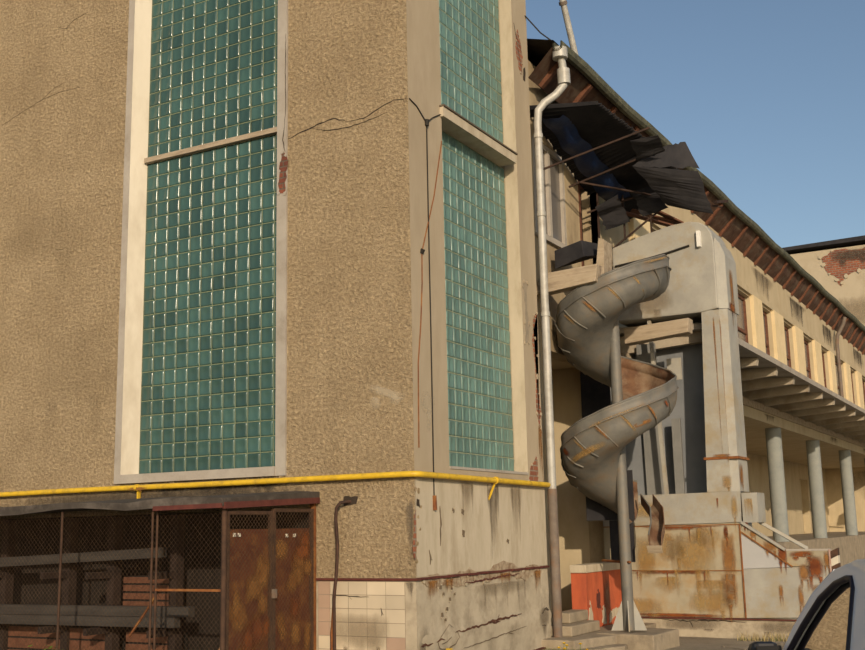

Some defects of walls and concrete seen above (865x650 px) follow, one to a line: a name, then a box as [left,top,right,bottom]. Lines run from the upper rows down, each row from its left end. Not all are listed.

spalling [515,29,526,81]
crack [3,83,79,125]
crack [282,43,406,151]
spalling [277,150,288,196]
spalling [818,247,865,286]
rust [724,466,752,506]
spalling [413,487,422,563]
rust [634,500,830,618]
spalling [422,550,540,623]